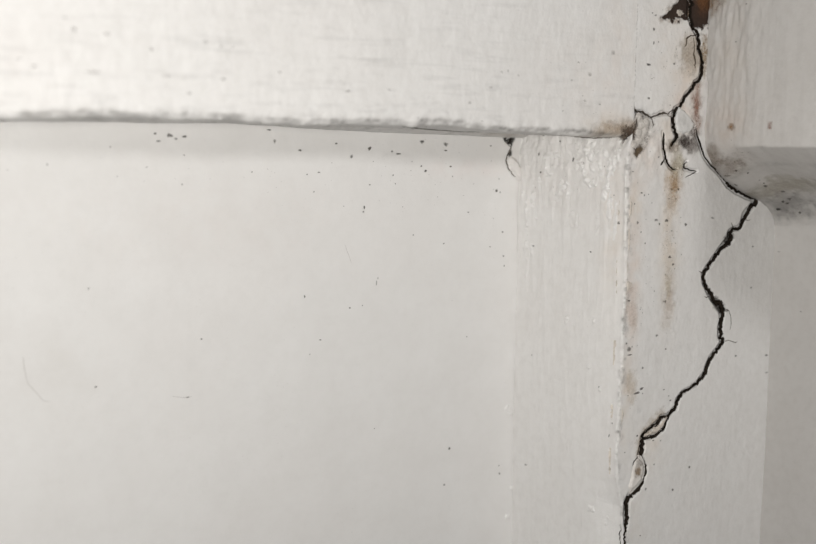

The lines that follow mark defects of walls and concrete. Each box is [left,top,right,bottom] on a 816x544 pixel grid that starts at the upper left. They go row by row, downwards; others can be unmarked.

spalling [660,0,715,31]
crack [619,0,758,544]